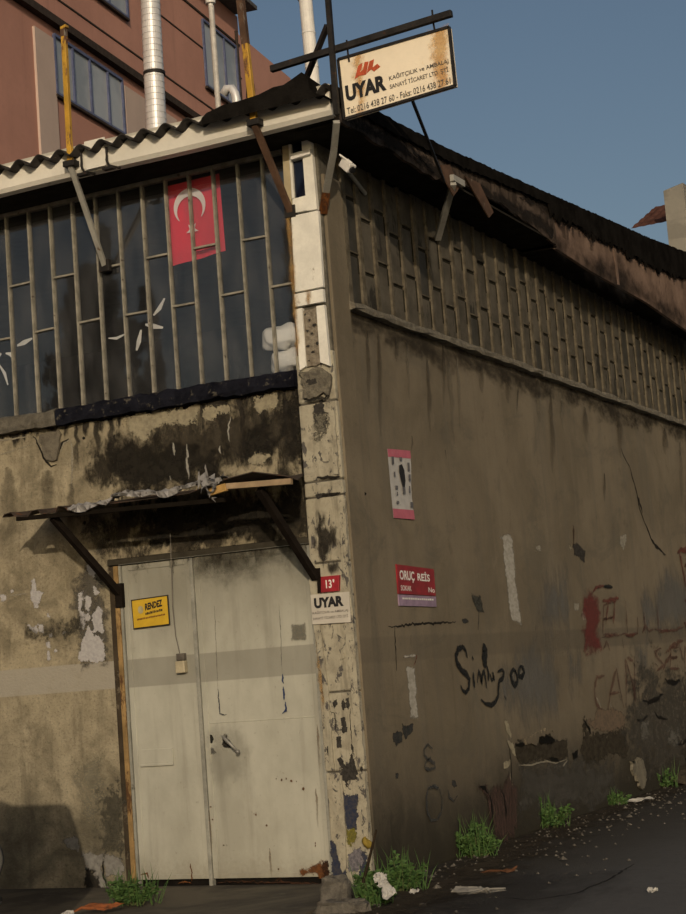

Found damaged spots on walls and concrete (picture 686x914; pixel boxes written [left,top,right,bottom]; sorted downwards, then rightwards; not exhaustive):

leakage [1,387,338,573]
crack [621,449,666,555]
spalling [69,564,110,667]
peeling [327,698,368,878]
spalling [503,662,686,819]
rust [218,860,331,884]